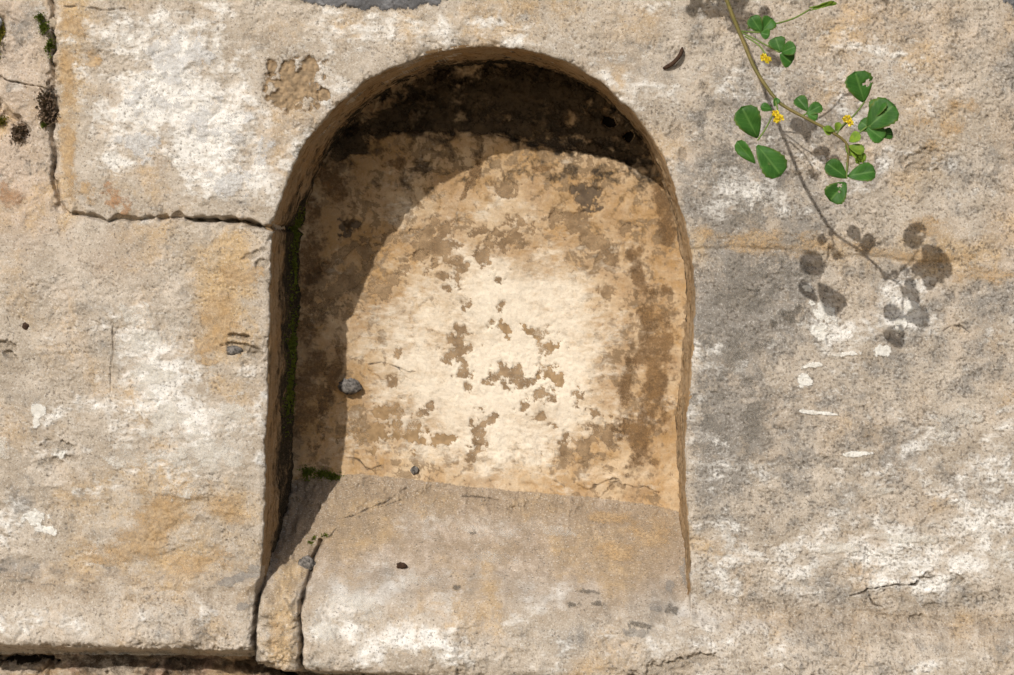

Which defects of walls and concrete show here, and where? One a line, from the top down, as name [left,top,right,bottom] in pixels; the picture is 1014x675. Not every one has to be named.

spalling [263,56,331,115]
water stain [461,156,482,199]
peeling [494,180,522,199]
water stain [574,141,637,164]
peeling [548,183,632,266]
peeling [304,214,542,321]
peeling [596,284,616,302]
peeling [441,301,625,469]
peeling [336,398,499,465]
crack [299,498,391,664]